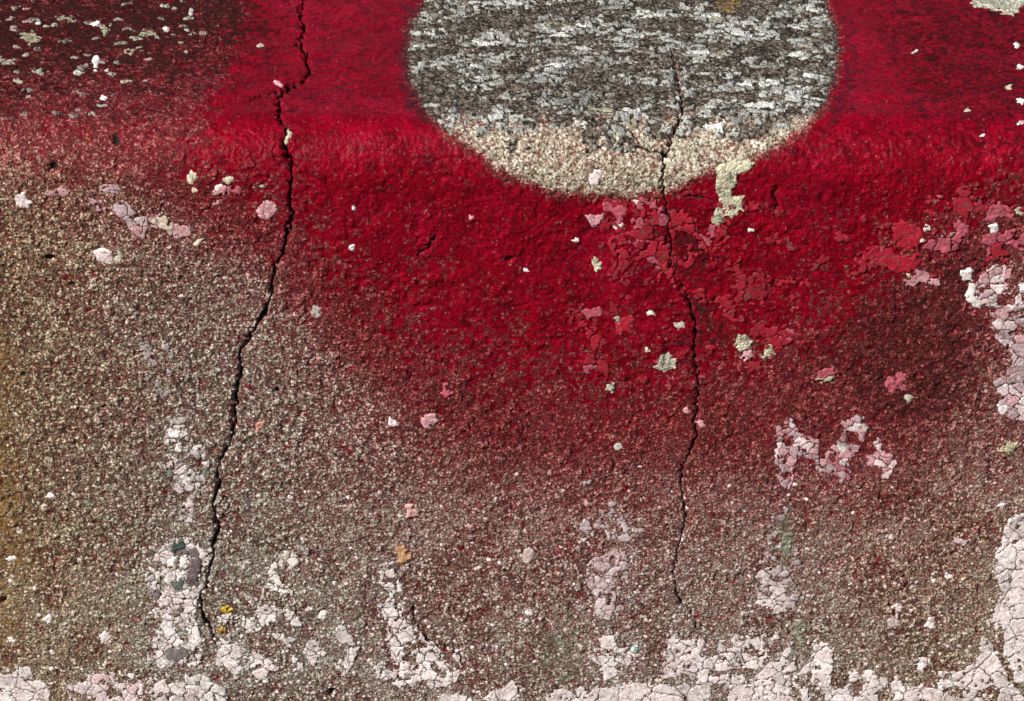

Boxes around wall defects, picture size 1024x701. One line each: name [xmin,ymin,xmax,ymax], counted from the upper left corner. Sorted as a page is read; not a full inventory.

crack [626,54,704,261]
crack [201,30,310,642]
peeling [565,197,829,376]
peeling [903,269,940,286]
peeling [920,185,1024,421]
crack [673,298,701,625]
peeling [774,414,897,490]
peeling [0,666,51,701]
peeling [66,538,326,701]
peeling [335,625,360,676]
peeling [372,561,520,701]
peeling [546,497,1024,701]